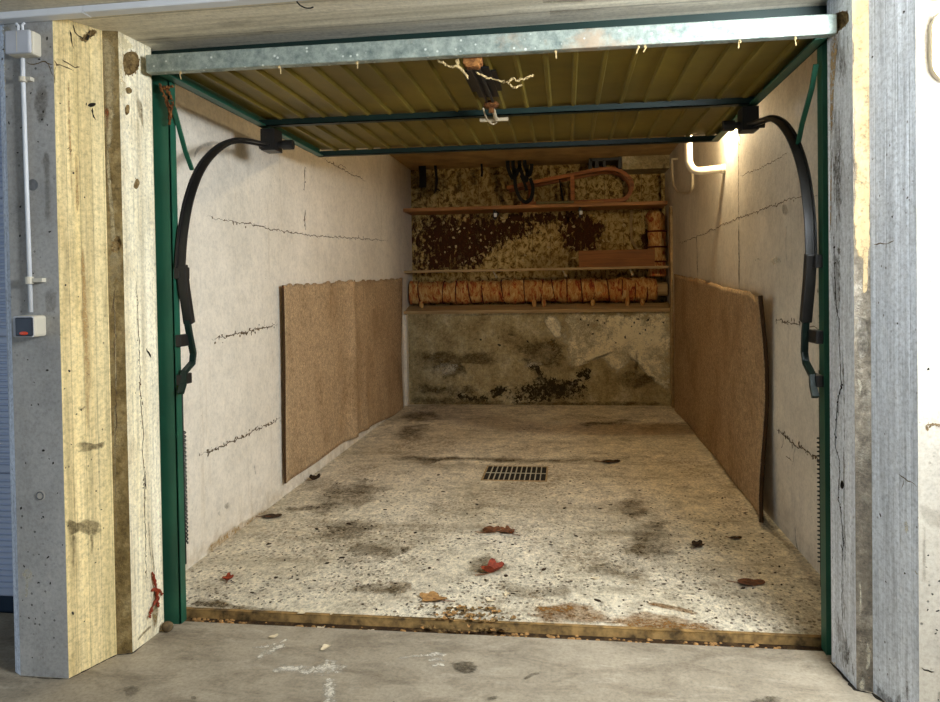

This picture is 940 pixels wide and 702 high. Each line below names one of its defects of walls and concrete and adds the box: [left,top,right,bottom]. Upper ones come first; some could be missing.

damp [399,339,659,436]
crack [817,236,844,621]